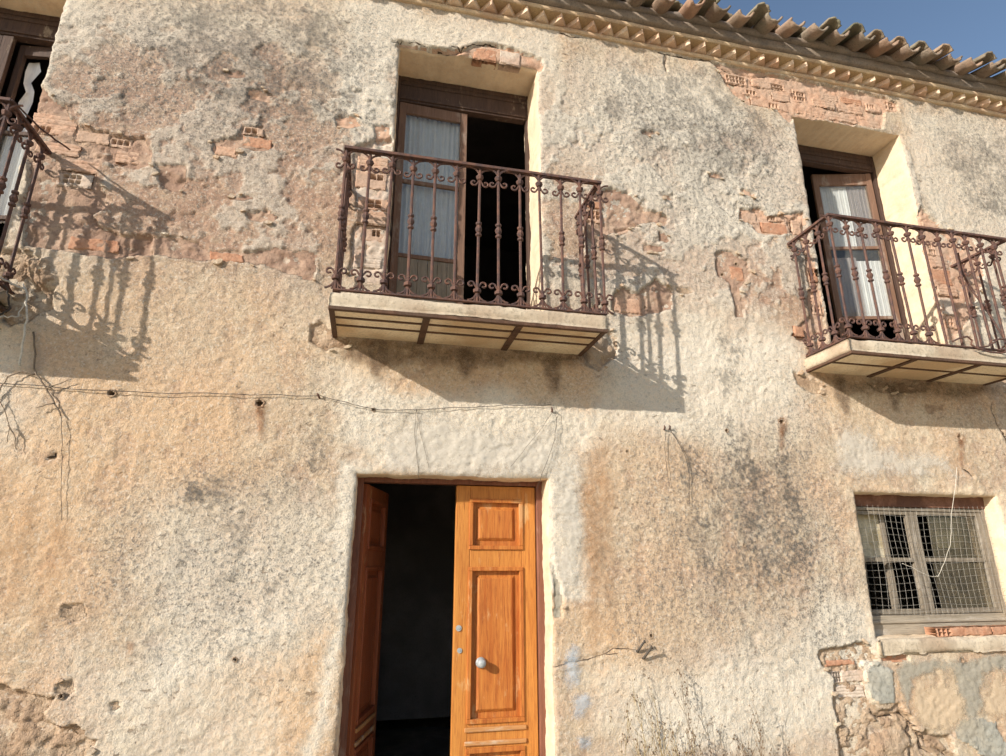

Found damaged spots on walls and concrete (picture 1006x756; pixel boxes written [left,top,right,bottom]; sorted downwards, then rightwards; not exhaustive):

spalling [397,44,543,74]
spalling [714,64,898,129]
spalling [0,86,317,326]
spalling [584,189,672,254]
water stain [346,340,585,388]
spalling [0,678,97,756]
spalling [817,638,967,756]
crack [872,711,945,756]
peeling [982,669,1006,718]